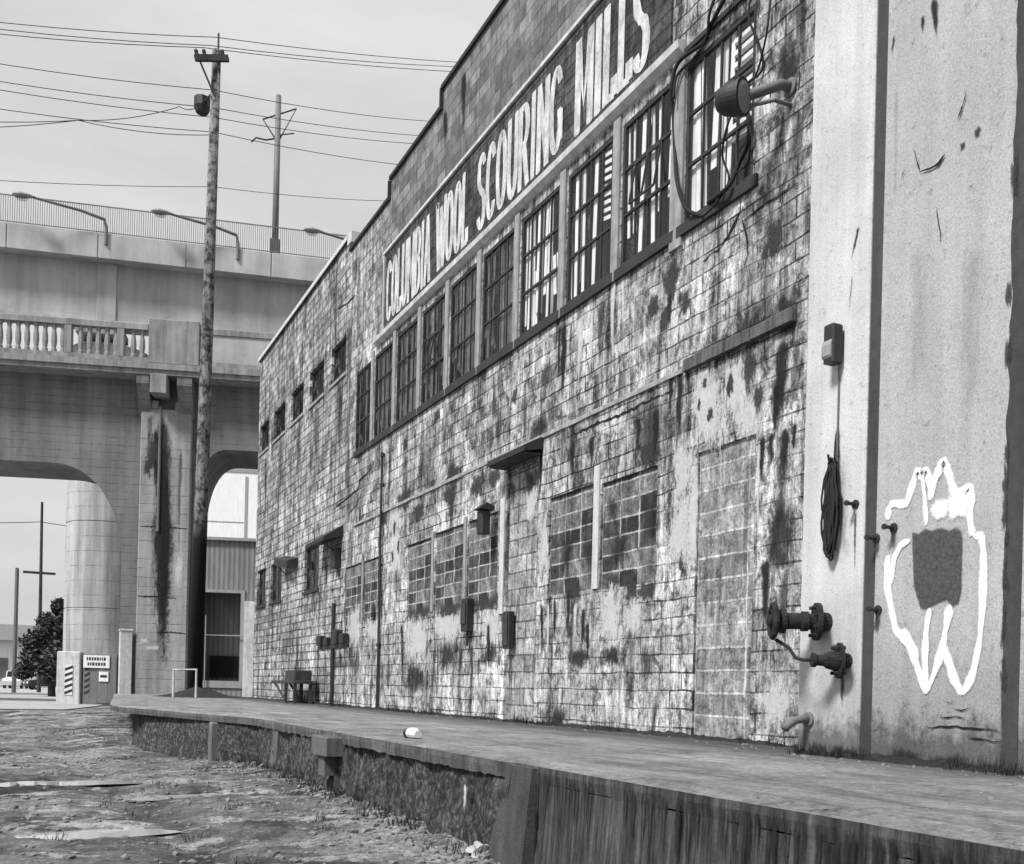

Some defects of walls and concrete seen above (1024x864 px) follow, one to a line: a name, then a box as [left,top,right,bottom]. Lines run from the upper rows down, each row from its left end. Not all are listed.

leakage [636,368,688,470]
leakage [510,450,543,504]
leakage [140,417,183,658]
leakage [400,625,429,693]
leakage [439,643,462,666]
leakage [478,624,500,677]
leakage [540,591,623,669]